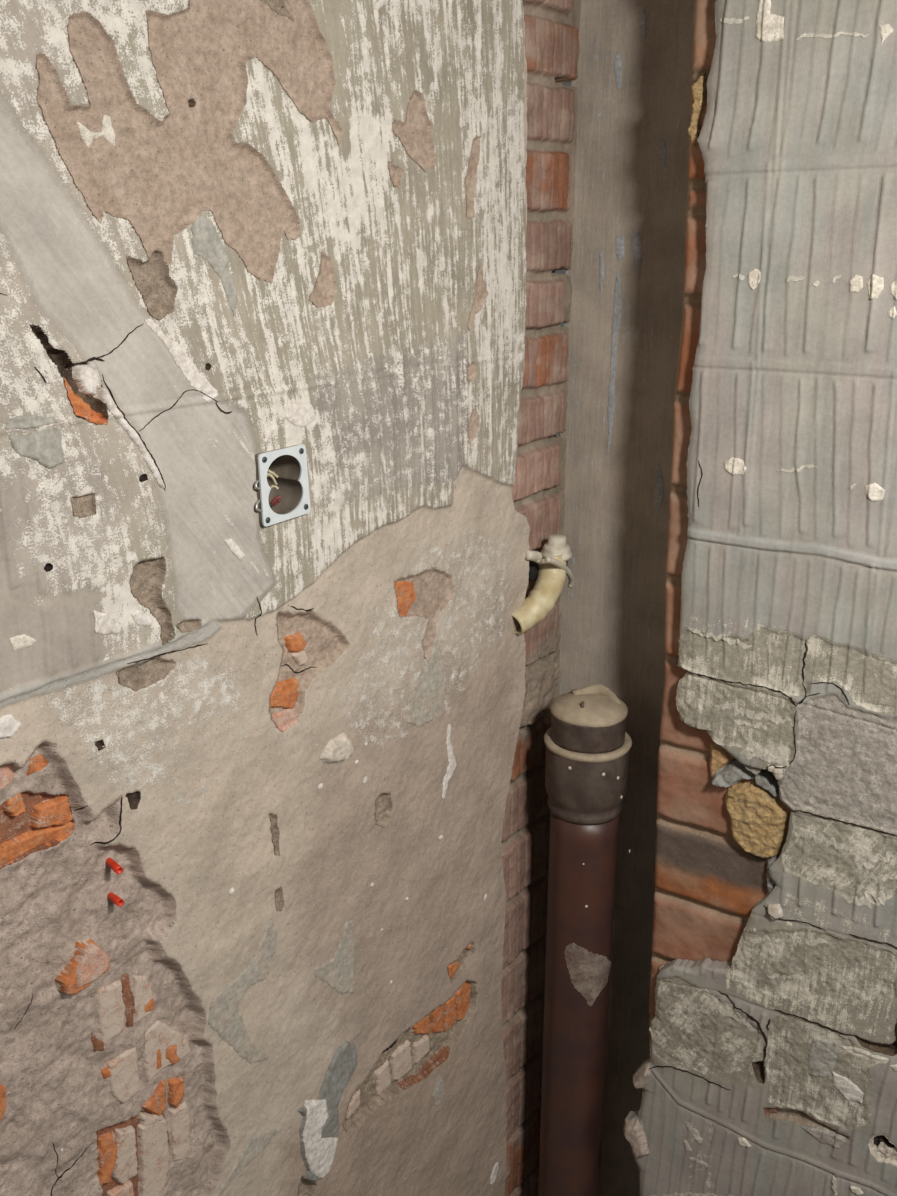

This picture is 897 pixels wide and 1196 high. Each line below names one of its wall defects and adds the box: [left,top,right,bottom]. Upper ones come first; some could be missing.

spalling [35,0,343,402]
spalling [388,90,436,189]
crack [34,323,233,491]
spalling [93,556,202,691]
spalling [269,610,351,732]
spalling [394,567,455,659]
peeling [676,623,897,906]
spalling [0,740,231,1196]
spalling [342,942,477,1133]
peeling [649,929,897,1166]
crack [51,1142,93,1196]